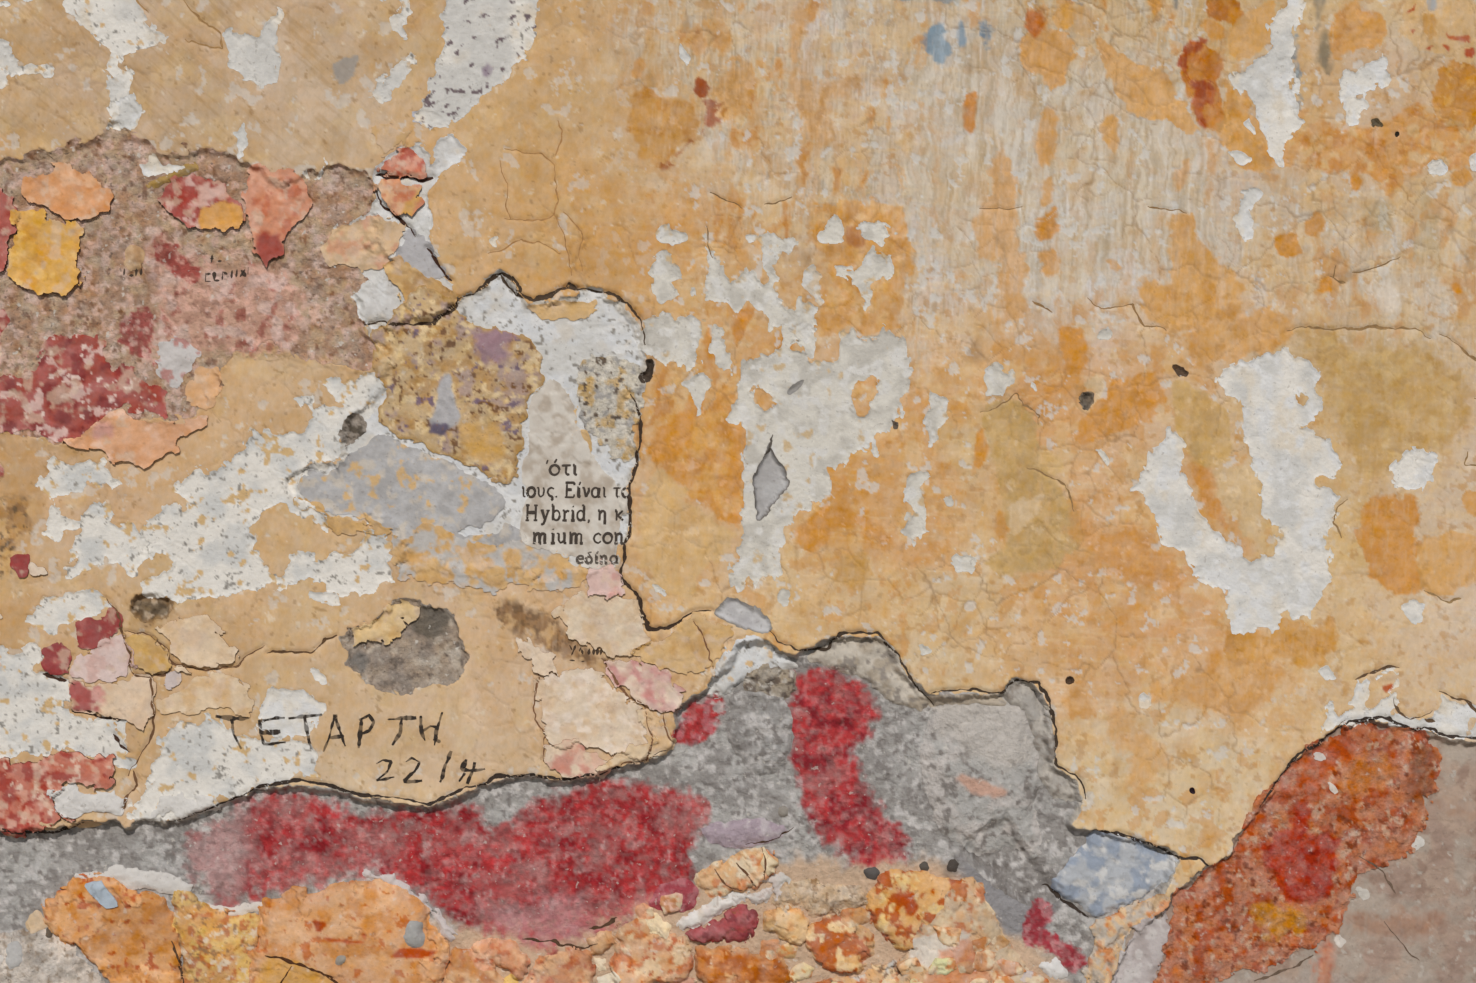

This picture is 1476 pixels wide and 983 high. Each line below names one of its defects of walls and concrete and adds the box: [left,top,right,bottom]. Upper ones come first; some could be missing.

peeling [1228,0,1306,168]
peeling [1232,187,1263,242]
crack [1330,257,1400,284]
crack [1087,297,1167,331]
crack [1287,324,1476,361]
spalling [0,0,1180,983]
crack [1027,468,1074,511]
peeling [1130,347,1342,635]
crack [1333,499,1348,538]
crack [1424,590,1461,603]
spalling [1319,667,1476,983]
spalling [1205,946,1317,983]